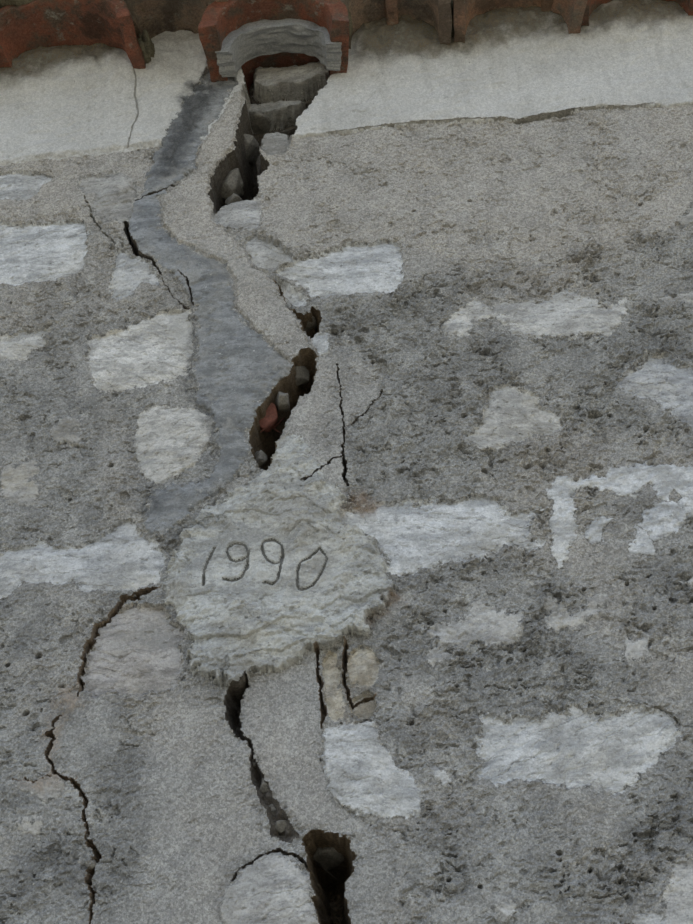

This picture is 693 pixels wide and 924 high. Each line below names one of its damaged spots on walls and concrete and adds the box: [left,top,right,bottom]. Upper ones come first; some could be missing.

crack [83,66,327,309]
crack [249,279,383,487]
crack [12,586,161,924]
crack [224,670,308,882]
crack [313,636,377,729]